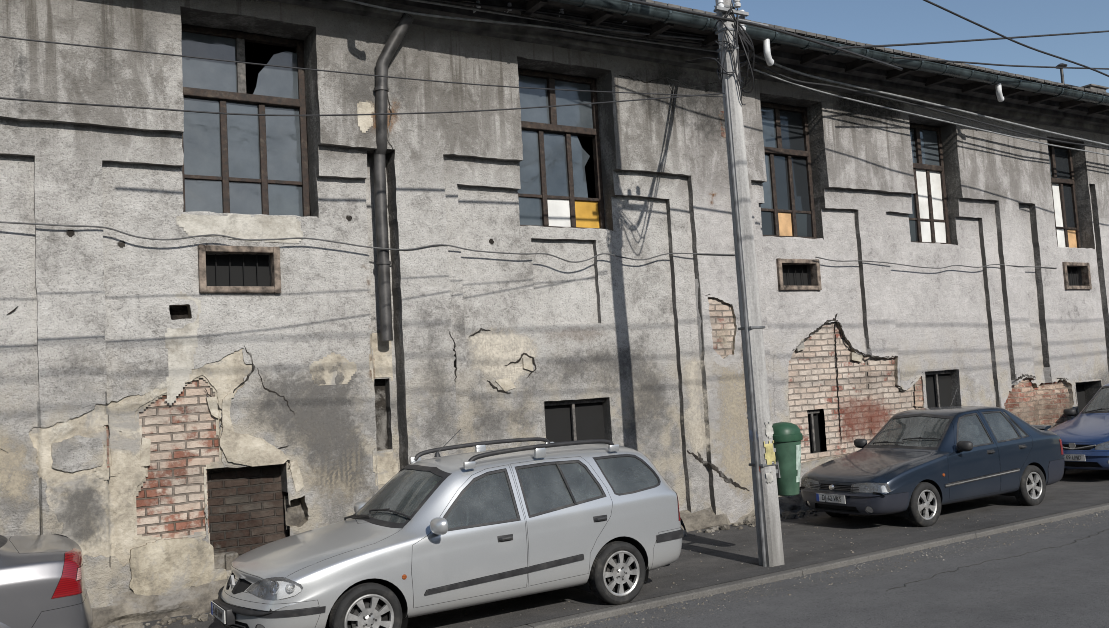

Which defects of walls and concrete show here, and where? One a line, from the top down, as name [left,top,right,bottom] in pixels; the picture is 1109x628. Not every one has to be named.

peeling [357,100,374,133]
crack [449,332,457,382]
peeling [469,327,536,393]
spalling [686,277,753,493]
spalling [773,305,930,481]
spalling [990,358,1079,430]
spalling [0,285,280,590]
crack [687,451,750,491]